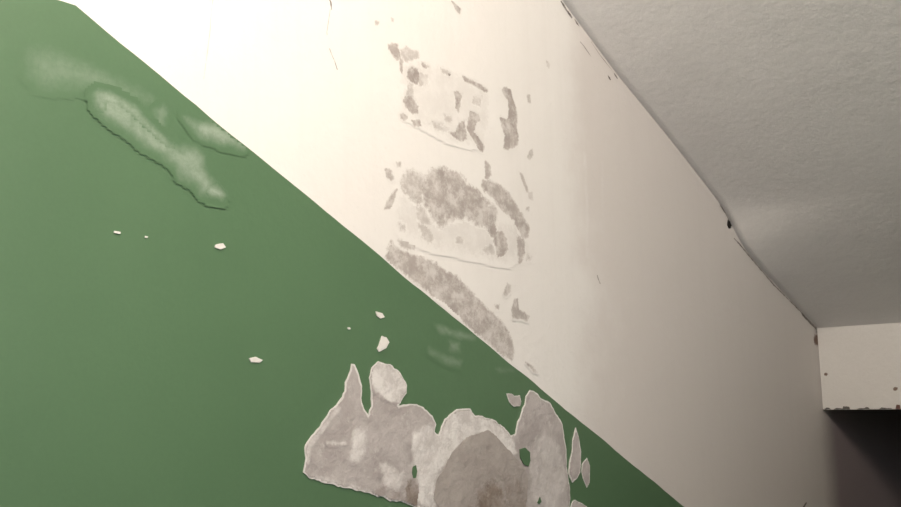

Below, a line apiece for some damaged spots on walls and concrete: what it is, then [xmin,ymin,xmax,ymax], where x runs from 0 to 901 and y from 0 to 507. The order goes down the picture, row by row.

damp [17,32,250,209]
peeling [387,40,534,163]
peeling [383,236,539,375]
peeling [303,336,590,507]